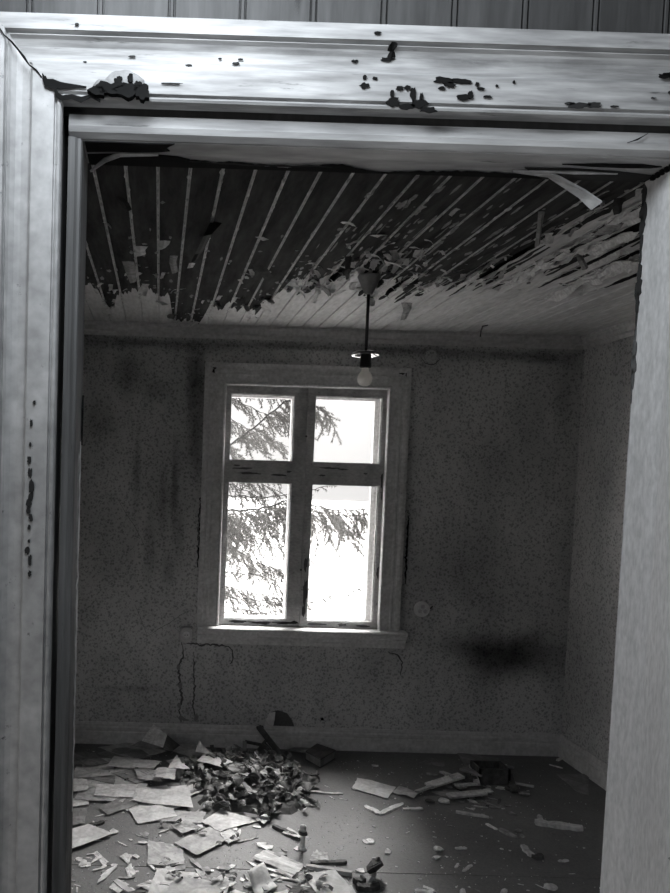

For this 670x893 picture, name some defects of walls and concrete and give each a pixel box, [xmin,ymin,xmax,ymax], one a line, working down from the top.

spalling [381,42,398,62]
peeling [386,85,438,113]
peeling [85,141,670,403]
spalling [24,442,34,577]